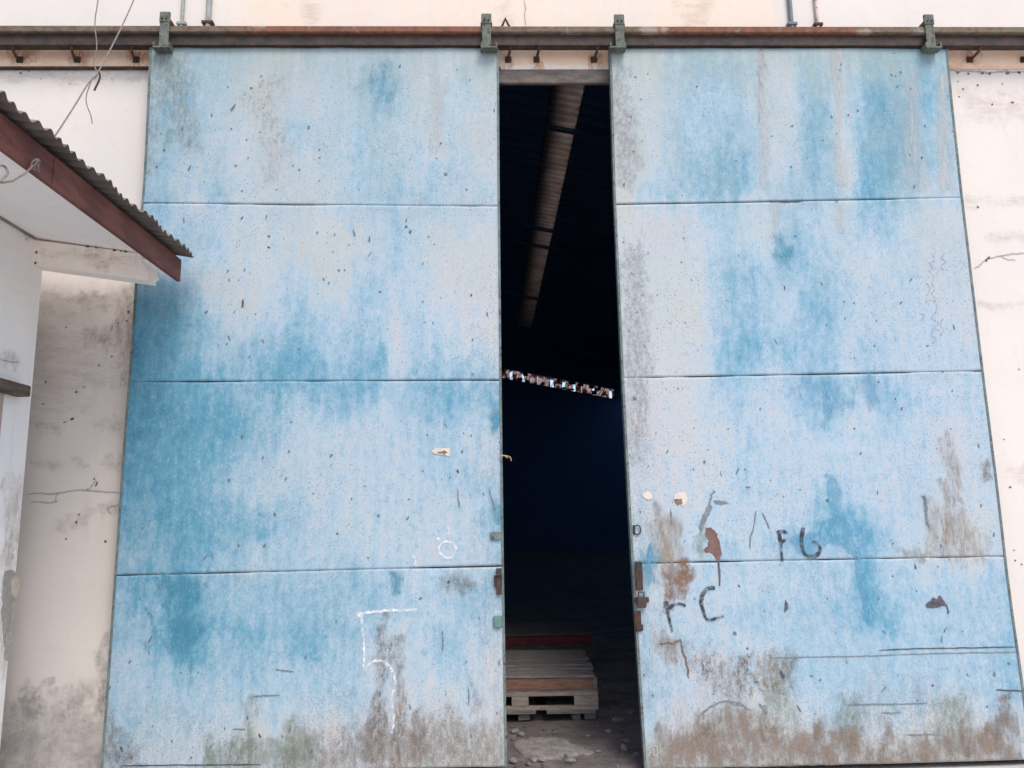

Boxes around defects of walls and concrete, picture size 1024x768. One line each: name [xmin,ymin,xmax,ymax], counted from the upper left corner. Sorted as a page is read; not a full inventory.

crack [975,252,1024,268]
crack [25,481,120,515]
rust [656,503,693,598]